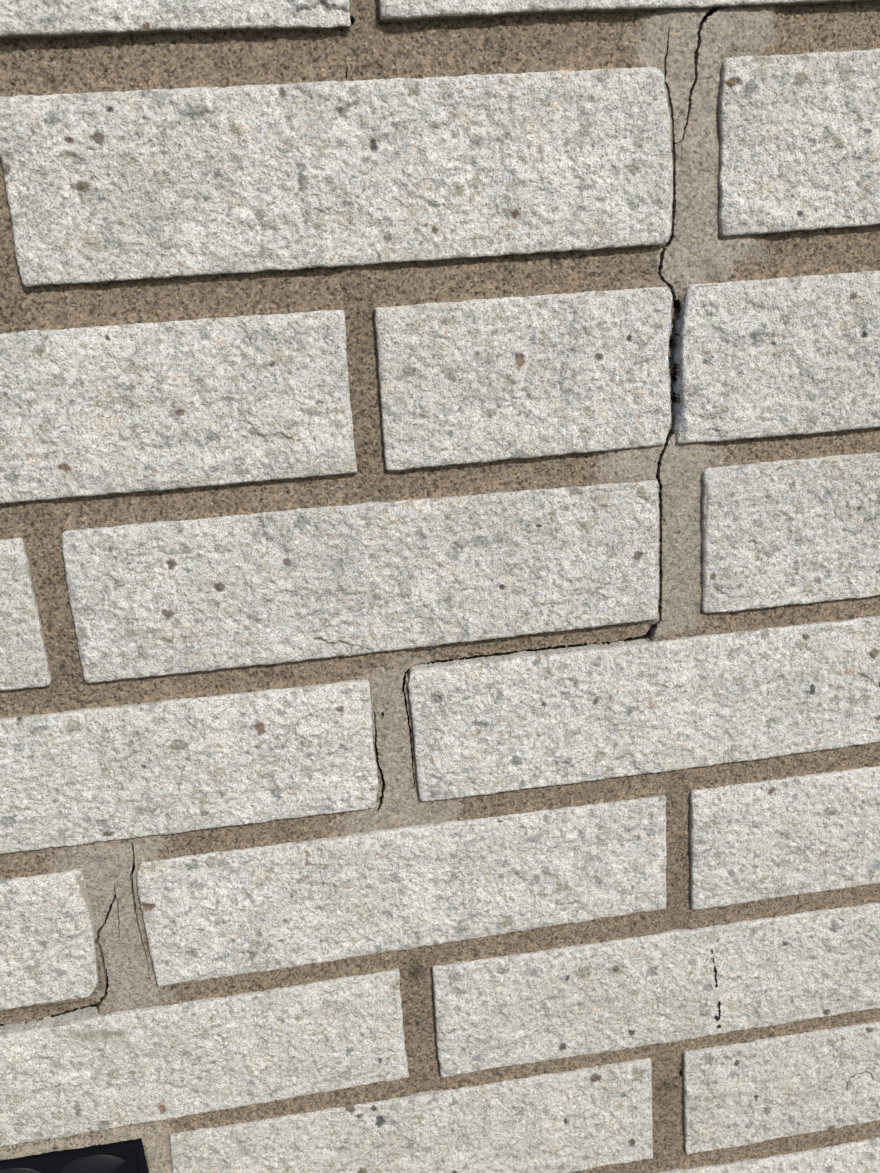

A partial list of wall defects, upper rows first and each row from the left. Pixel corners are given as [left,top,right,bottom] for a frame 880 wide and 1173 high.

crack [687,8,711,113]
crack [402,194,680,779]
crack [370,689,385,804]
crack [0,845,136,1026]